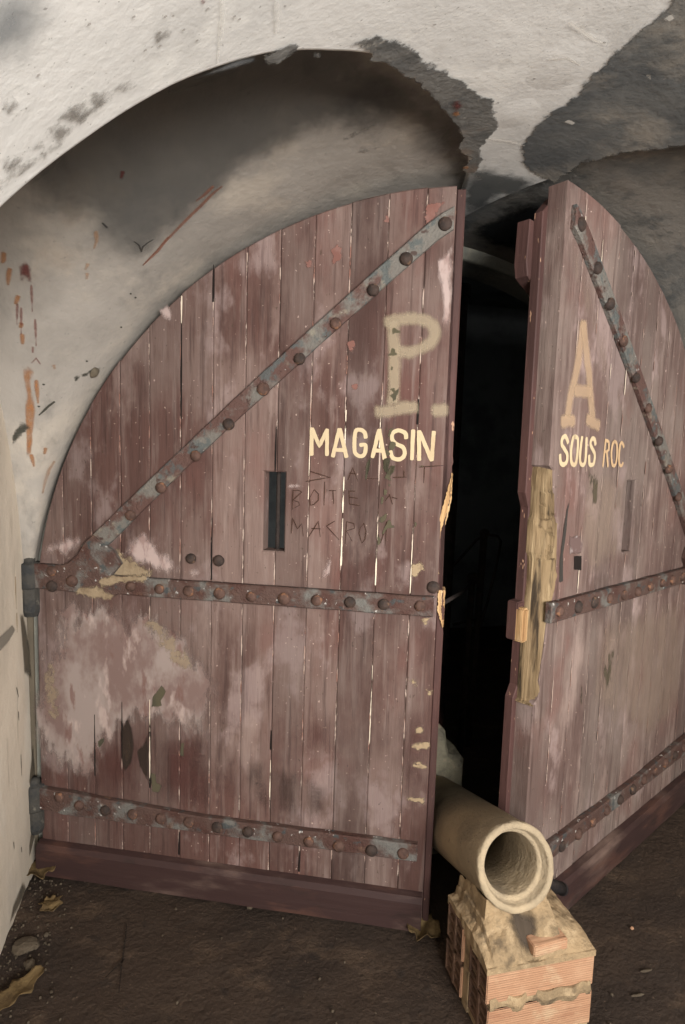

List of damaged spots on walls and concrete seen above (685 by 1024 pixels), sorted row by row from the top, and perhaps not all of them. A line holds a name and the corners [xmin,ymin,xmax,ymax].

water stain [4,50,449,247]
peeling [265,44,299,64]
peeling [355,35,499,173]
flaking render [521,0,685,182]
rust [14,287,47,466]